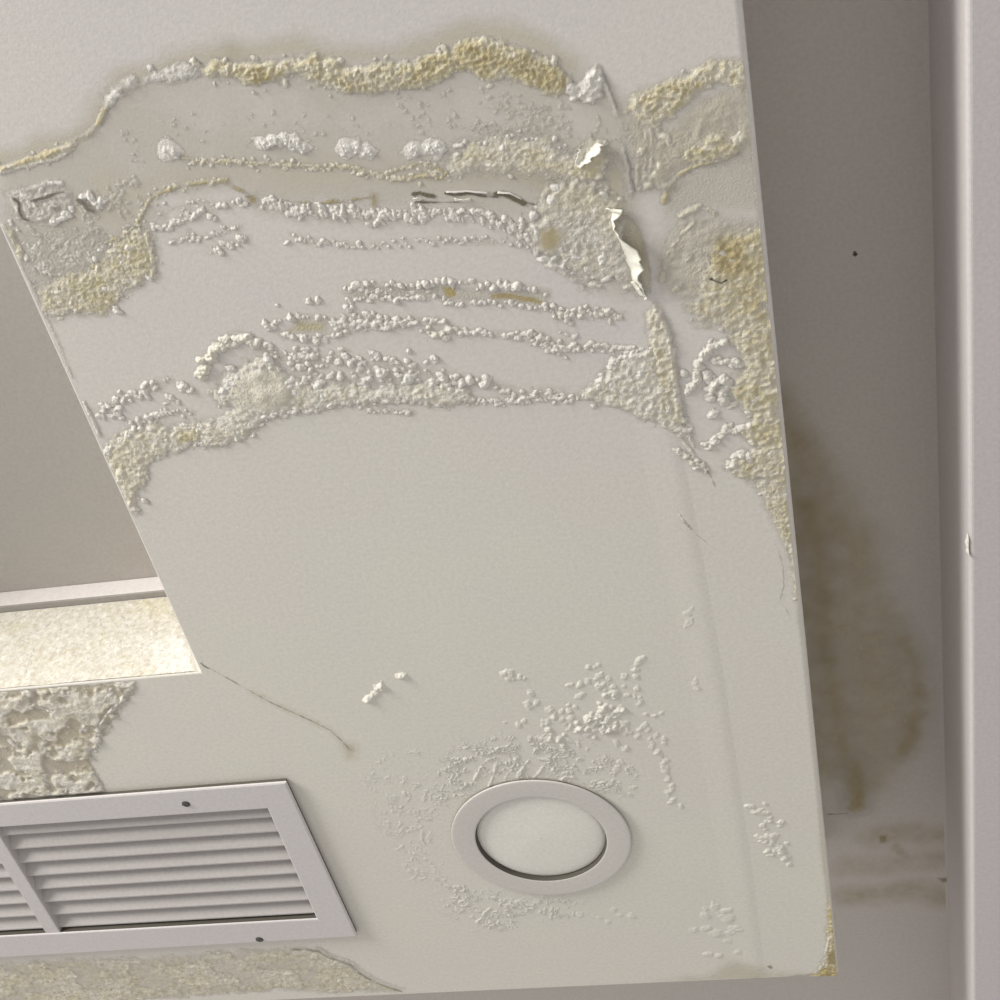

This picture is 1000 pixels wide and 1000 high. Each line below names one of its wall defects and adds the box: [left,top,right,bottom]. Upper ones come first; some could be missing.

spalling [7,180,107,226]
water stain [0,31,786,516]
crack [411,190,537,206]
spalling [524,137,650,300]
spalling [0,681,136,798]